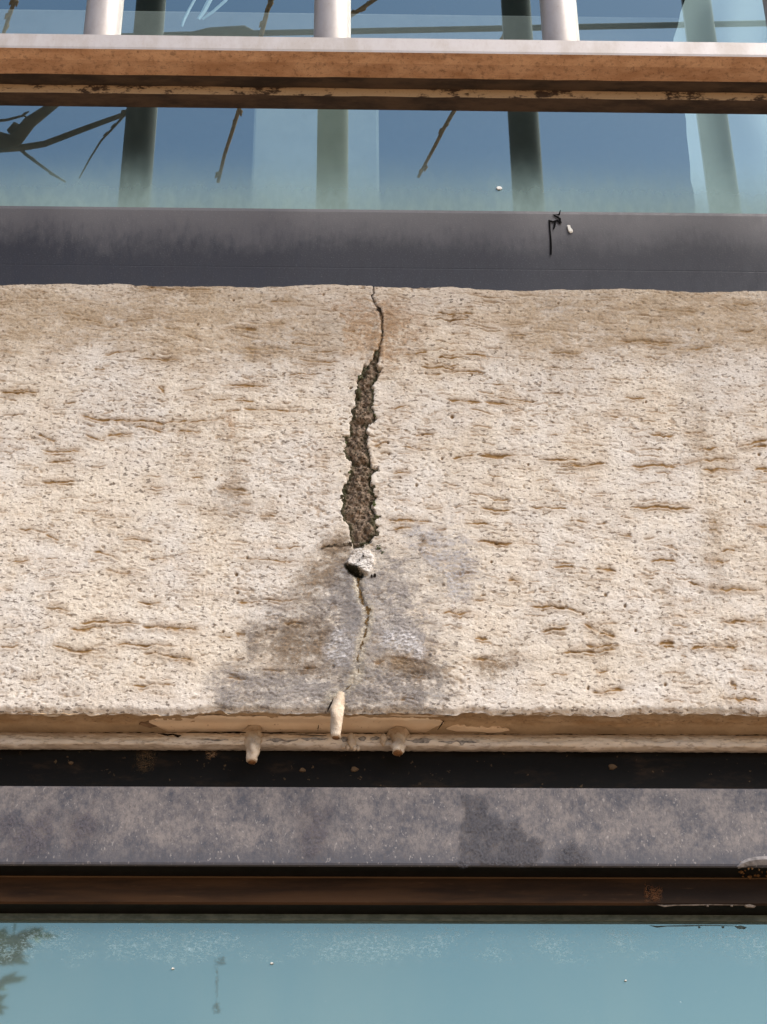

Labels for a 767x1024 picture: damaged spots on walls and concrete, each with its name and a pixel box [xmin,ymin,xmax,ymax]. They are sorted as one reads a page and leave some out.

damp [139,530,509,764]
crack [324,286,384,696]